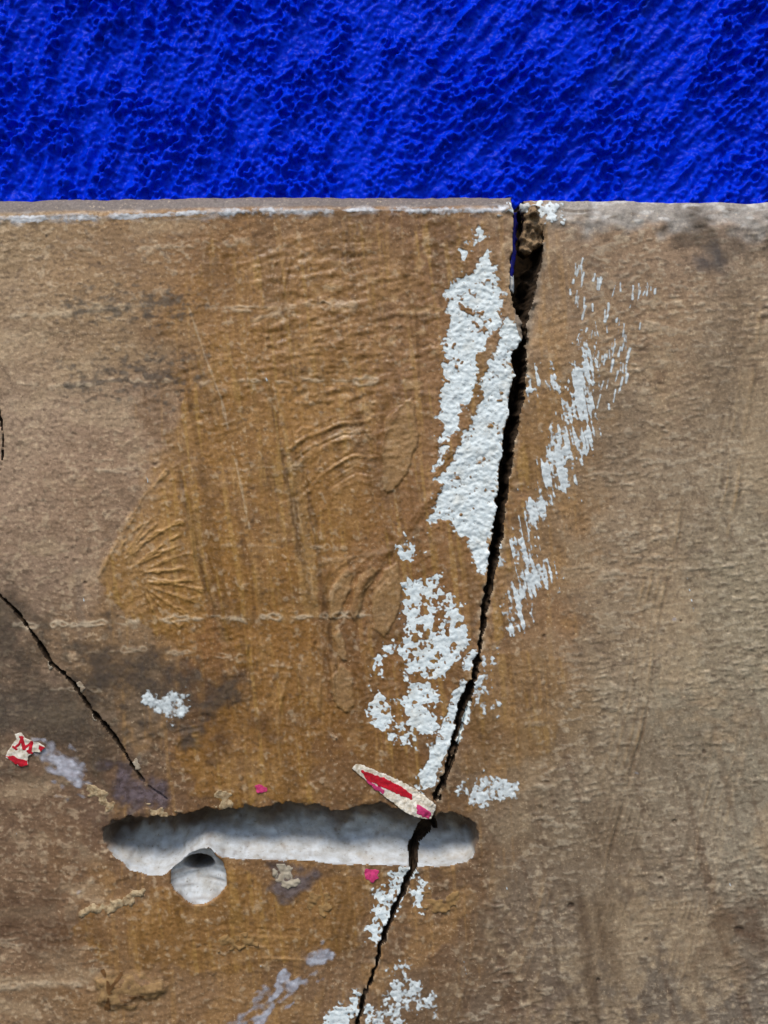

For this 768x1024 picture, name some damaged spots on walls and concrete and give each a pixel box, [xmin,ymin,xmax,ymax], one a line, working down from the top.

peeling [426,226,656,637]
peeling [395,532,427,562]
crack [355,202,544,1024]
crack [0,593,152,788]
peeling [365,572,502,794]
spalling [145,802,176,817]
spalling [214,790,233,810]
spalling [273,864,300,889]
peeling [364,866,460,945]
peeling [323,960,437,1024]